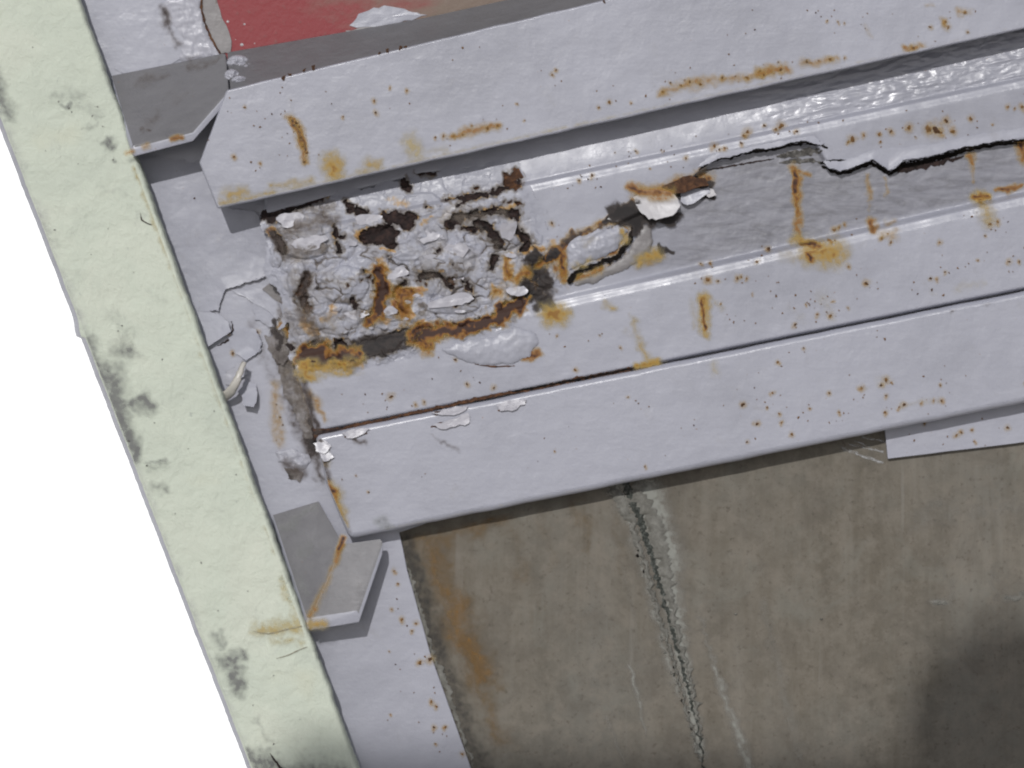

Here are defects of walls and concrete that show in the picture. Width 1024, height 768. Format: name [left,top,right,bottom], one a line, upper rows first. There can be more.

rust [645,53,793,100]
rust [227,65,344,180]
rust [298,270,311,306]
peeling [137,155,569,376]
rust [363,215,628,358]
rust [694,262,756,338]
rust [790,166,892,289]
peeling [225,361,258,408]
peeling [342,428,370,443]
peeling [431,406,470,429]
peeling [497,399,526,411]
crack [609,479,706,768]